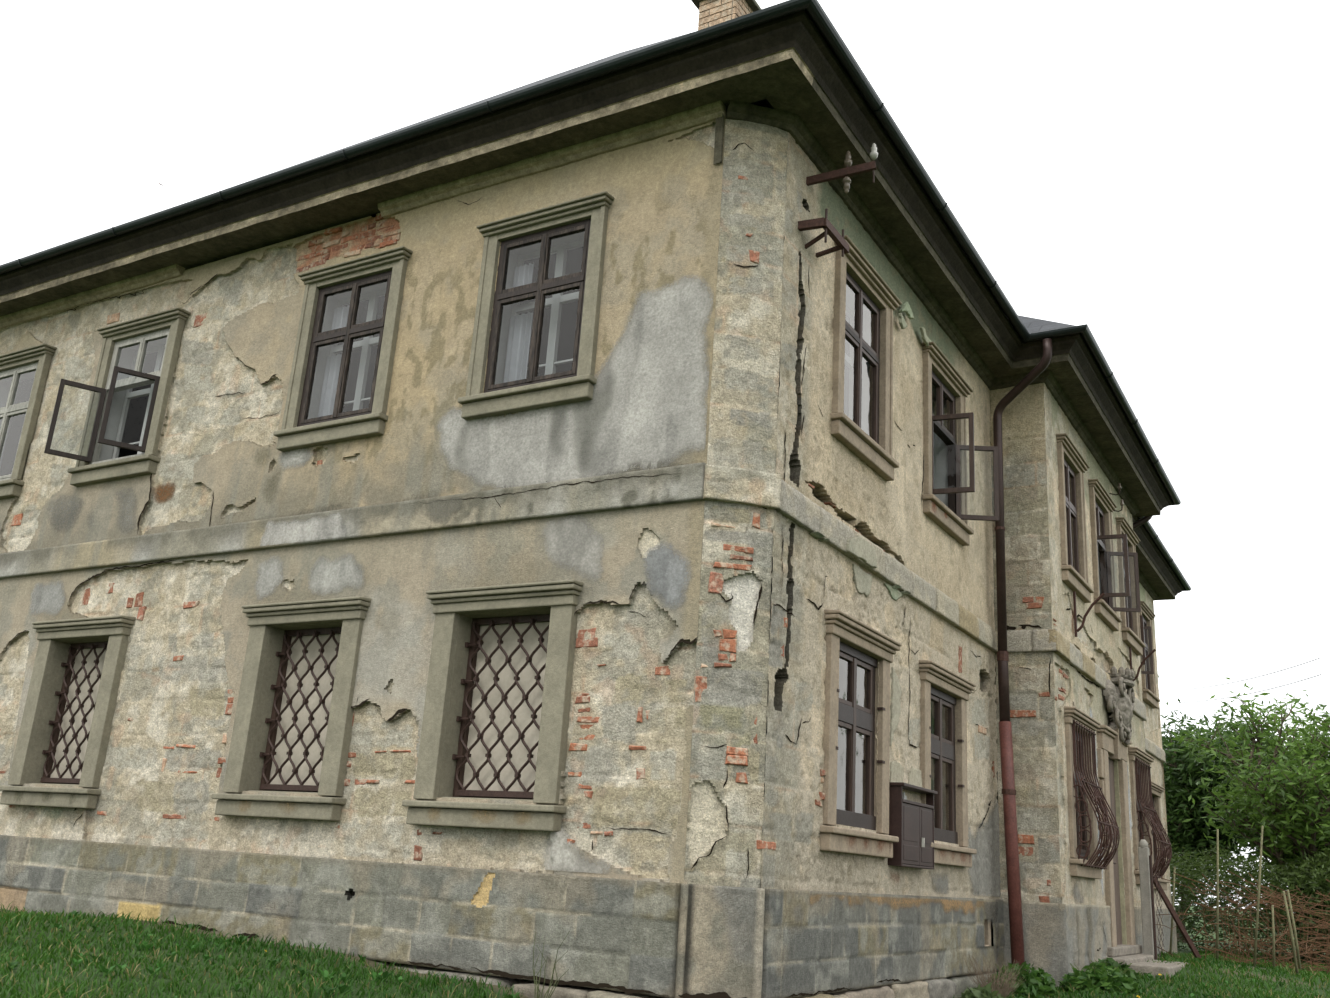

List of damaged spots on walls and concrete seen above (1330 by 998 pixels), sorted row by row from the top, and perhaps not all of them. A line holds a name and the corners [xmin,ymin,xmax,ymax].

peeling [0,213,401,553]
crack [216,359,279,419]
crack [734,251,823,488]
spalling [637,528,660,558]
flaking render [708,544,754,594]
crack [720,507,828,667]
peeling [846,529,911,601]
peeling [0,559,737,882]
flaking render [725,717,758,784]